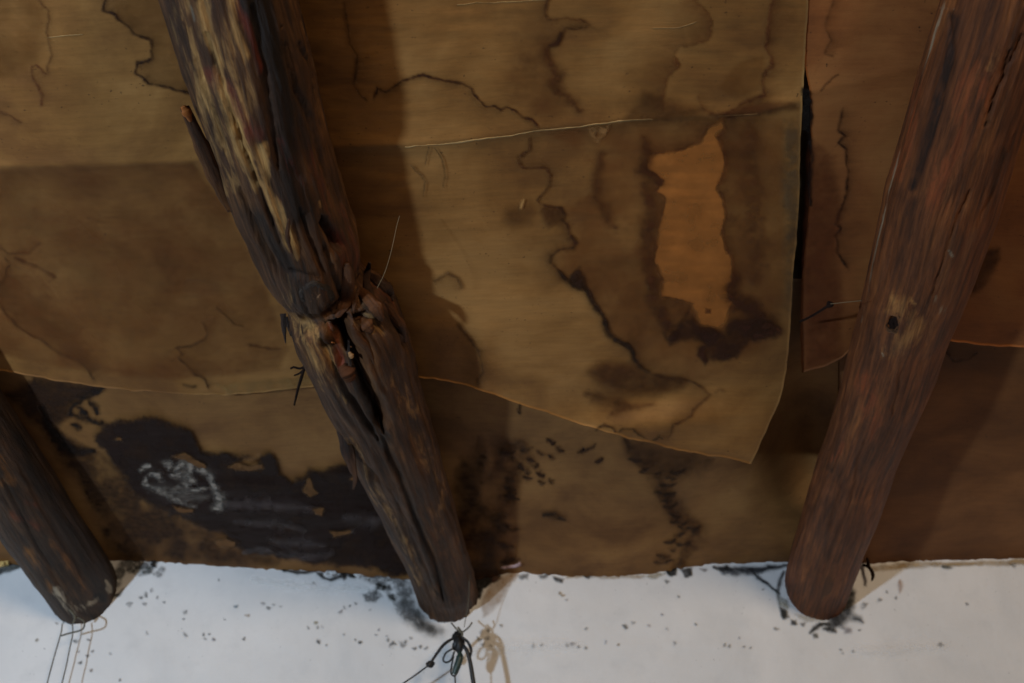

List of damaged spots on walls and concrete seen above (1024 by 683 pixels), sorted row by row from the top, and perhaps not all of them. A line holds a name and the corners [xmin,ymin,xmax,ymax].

leakage [353,49,538,127]
leakage [639,0,781,363]
leakage [518,138,707,429]
mould [113,560,163,597]
leakage [458,438,564,580]
leakage [598,425,700,568]